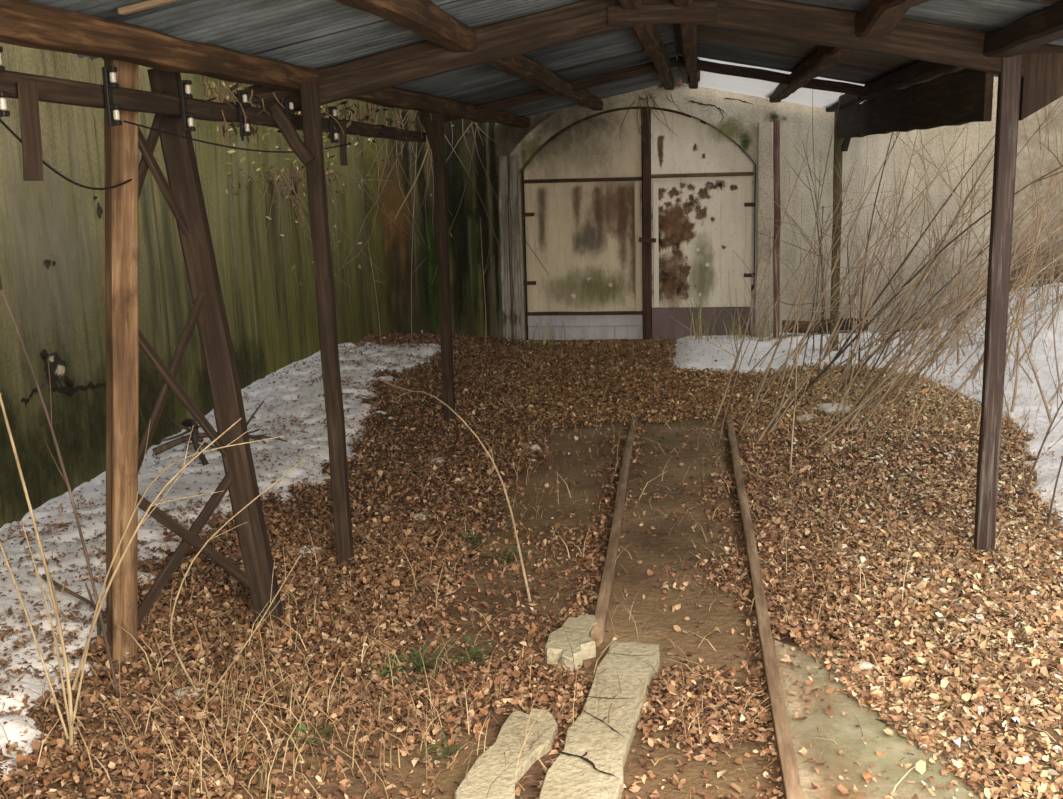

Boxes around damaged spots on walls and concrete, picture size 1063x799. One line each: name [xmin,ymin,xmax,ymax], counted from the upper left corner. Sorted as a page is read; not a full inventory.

leakage [367,111,434,316]
leakage [444,115,579,320]
rust [595,187,642,279]
rust [651,181,738,300]
crack [556,749,618,778]
crack [577,694,629,737]